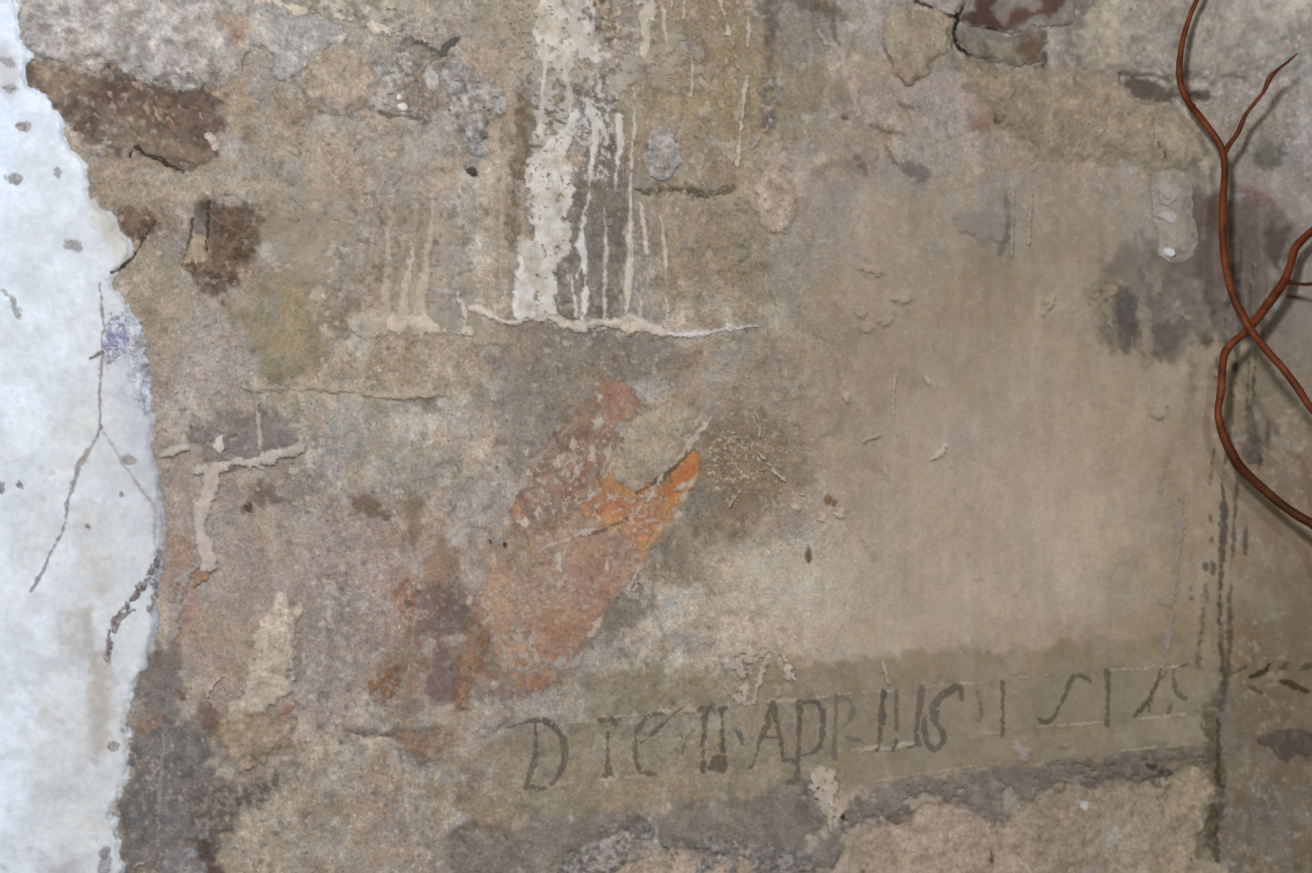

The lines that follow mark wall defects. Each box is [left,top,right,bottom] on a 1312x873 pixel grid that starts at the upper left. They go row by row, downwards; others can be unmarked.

crack [914,0,955,17]
spalling [0,57,227,172]
damp [376,0,758,340]
spalling [64,240,82,250]
spalling [181,195,263,305]
damp [229,187,358,373]
peeling [102,303,152,414]
crack [30,218,162,662]
damp [1197,485,1248,863]
spalling [98,847,112,873]
spalling [548,734,1228,873]